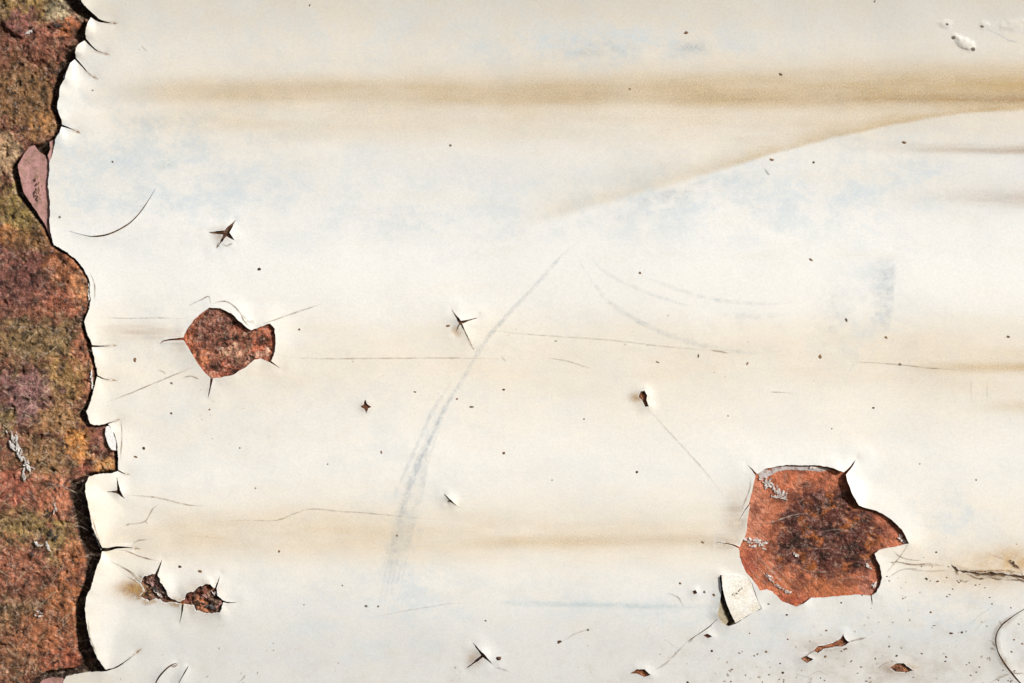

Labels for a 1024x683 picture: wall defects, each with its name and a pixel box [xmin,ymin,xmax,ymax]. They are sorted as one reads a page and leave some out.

crack [194,205,251,263]
peeling [0,0,301,683]
crack [435,294,495,365]
peeling [628,381,659,416]
peeling [686,435,931,671]
crack [935,550,1024,683]
crack [448,627,509,683]